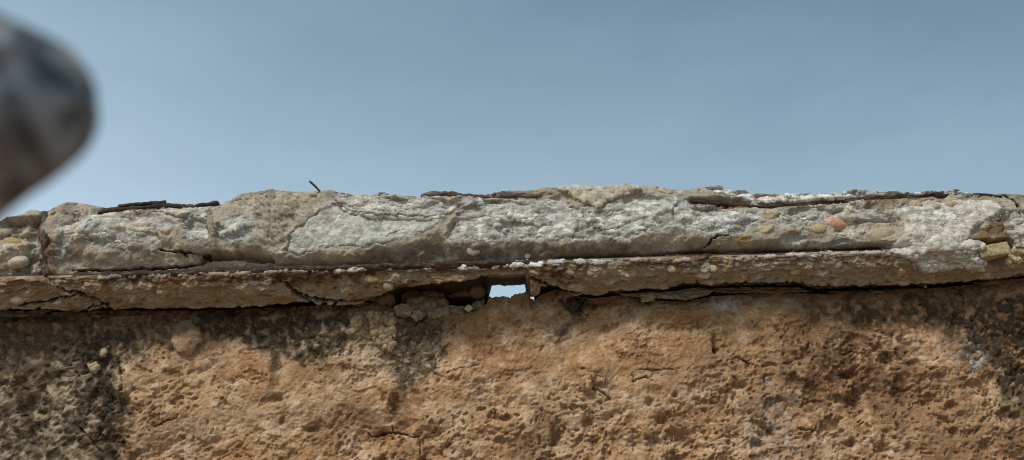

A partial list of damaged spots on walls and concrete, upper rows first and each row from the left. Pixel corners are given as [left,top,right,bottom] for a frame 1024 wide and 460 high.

rust [72,200,220,217]
rust [691,193,1002,211]
spalling [284,183,1024,275]
rust [0,215,59,281]
crack [23,249,212,308]
crack [286,281,342,303]
crack [606,273,1023,294]